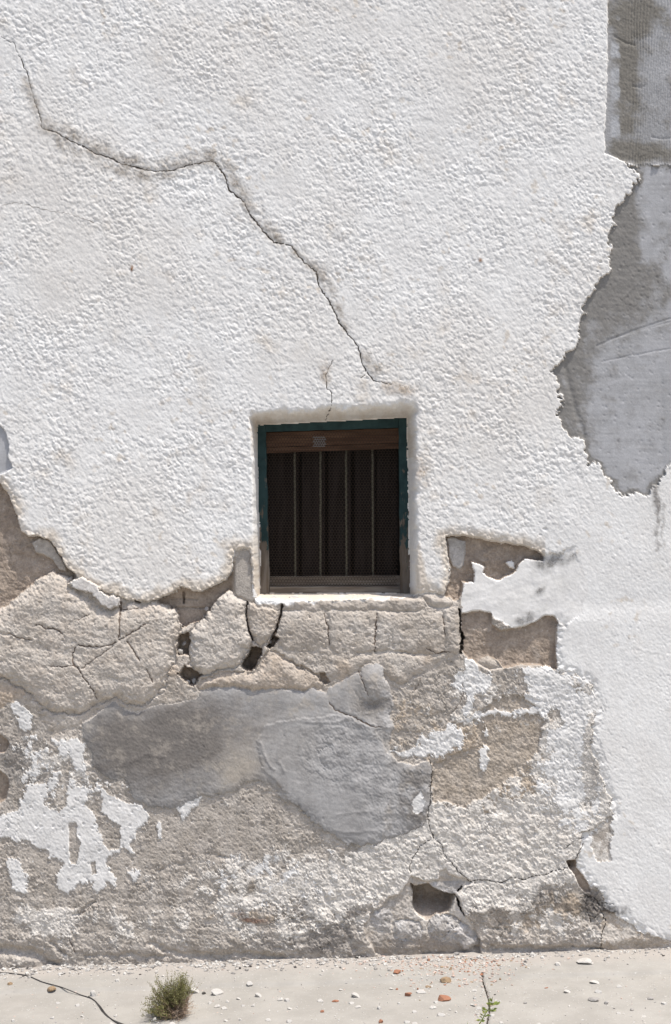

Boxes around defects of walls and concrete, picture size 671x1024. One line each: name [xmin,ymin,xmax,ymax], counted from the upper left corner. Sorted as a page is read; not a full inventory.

crack [1,36,391,385]
spalling [0,484,76,608]
crack [9,601,153,699]
crack [246,601,283,647]
crack [426,609,465,654]
spalling [0,536,617,894]
crack [329,671,380,728]
peeling [203,853,338,908]
spalling [366,868,481,956]
crack [409,761,584,914]
crack [584,894,613,948]